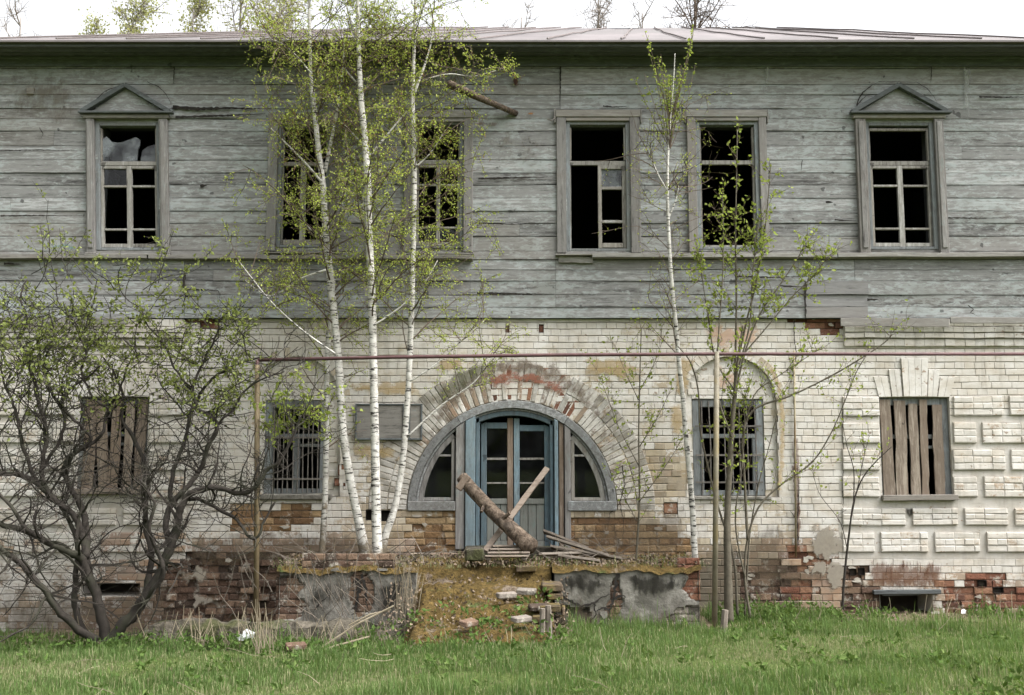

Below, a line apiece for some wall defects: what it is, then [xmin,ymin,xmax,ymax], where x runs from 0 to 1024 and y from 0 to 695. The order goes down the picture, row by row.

spalling [154,552,395,622]
crack [563,574,626,622]
spalling [733,525,881,614]